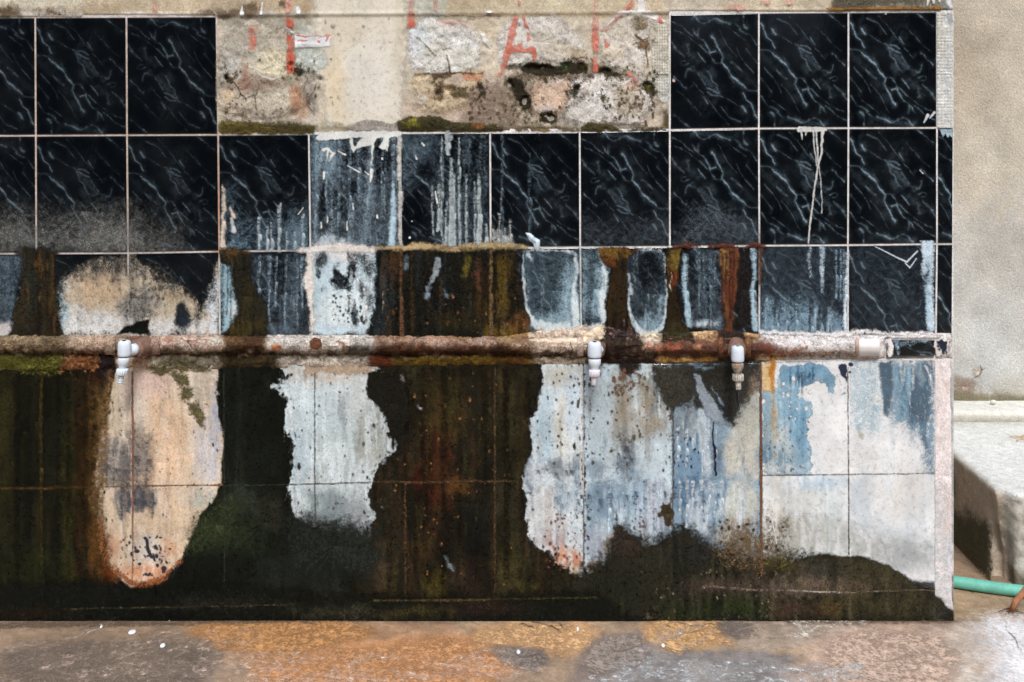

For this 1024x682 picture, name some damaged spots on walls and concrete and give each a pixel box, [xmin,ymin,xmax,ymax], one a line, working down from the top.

flaking render [0,0,371,132]
flaking render [390,0,953,132]
damp [0,212,238,337]
damp [220,131,610,344]
corrosion [664,241,766,360]
damp [502,214,947,582]
damp [35,365,227,588]